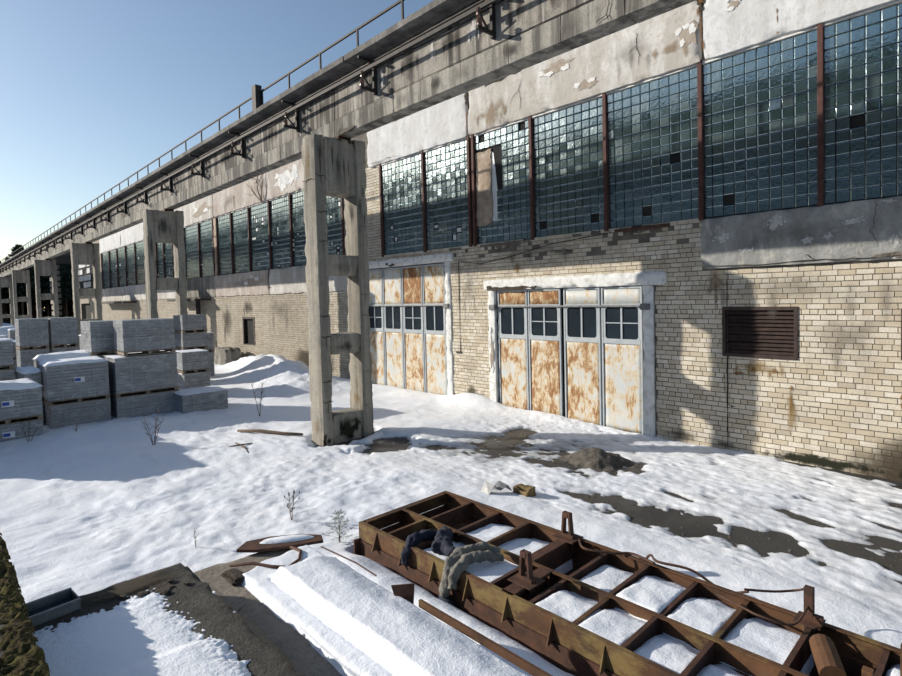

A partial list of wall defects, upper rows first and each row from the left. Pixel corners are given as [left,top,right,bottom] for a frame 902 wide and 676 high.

peeling [675,0,705,47]
crack [347,0,610,114]
peeling [539,57,576,77]
peeling [573,76,598,91]